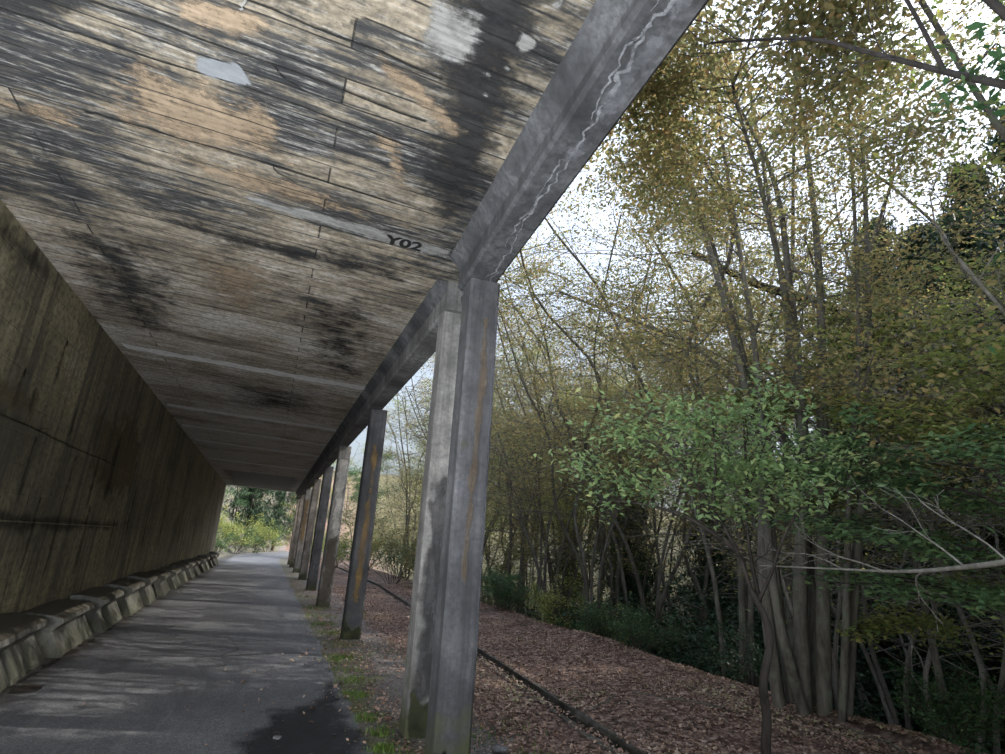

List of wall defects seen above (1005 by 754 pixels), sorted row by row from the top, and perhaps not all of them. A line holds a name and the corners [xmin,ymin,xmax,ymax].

peeling [100,61,365,219]
crack [486,0,677,281]
rust [461,319,488,580]